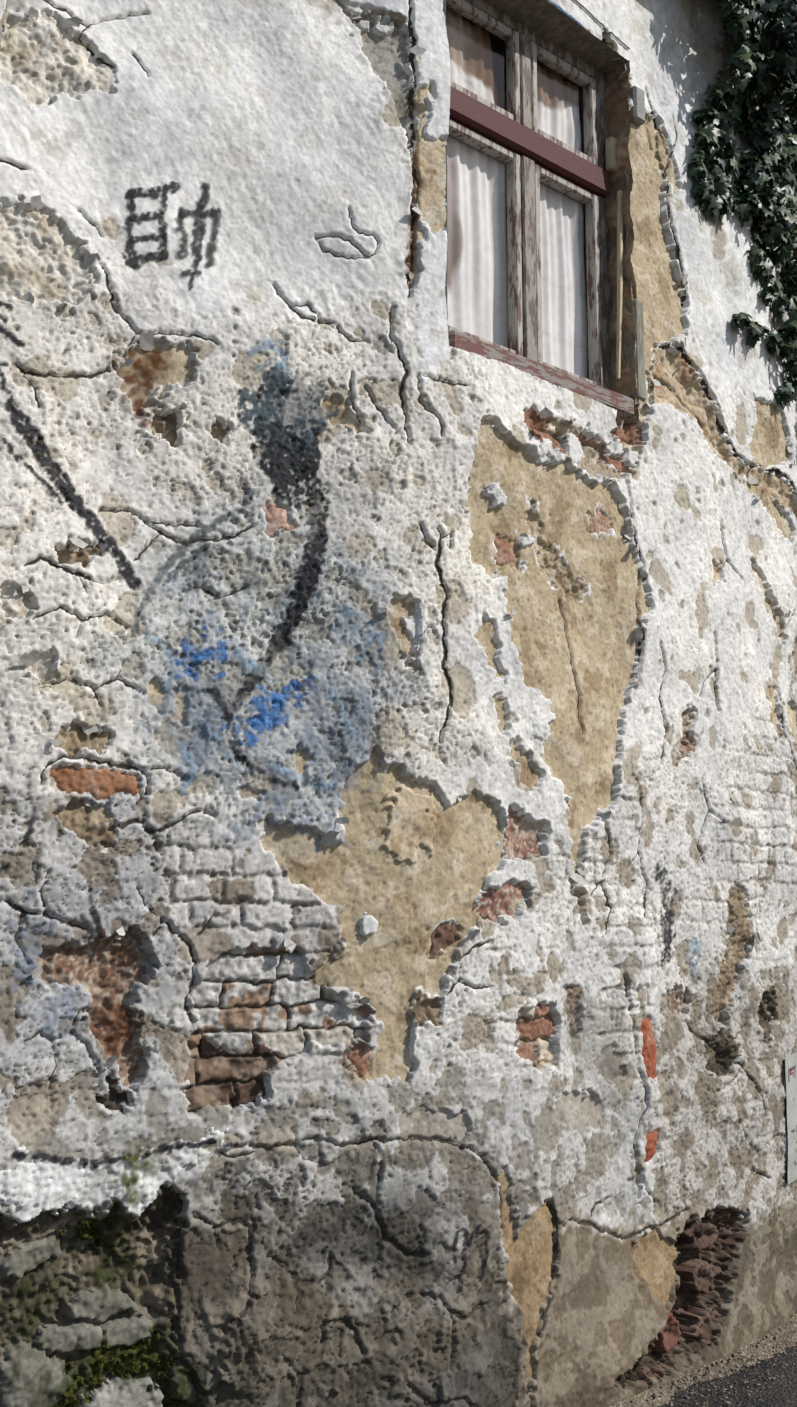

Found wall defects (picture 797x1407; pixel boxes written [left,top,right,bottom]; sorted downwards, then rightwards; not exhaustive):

flaking render [0,0,115,109]
crack [15,209,219,408]
crack [275,0,468,443]
flaking render [336,0,446,289]
crack [415,525,453,743]
flaking render [464,111,797,924]
flaking render [50,722,140,853]
flaking render [182,745,545,1113]
crack [538,977,685,1336]
flaking render [0,1285,198,1407]
flaking render [494,1167,557,1407]
spalling [614,1207,748,1388]